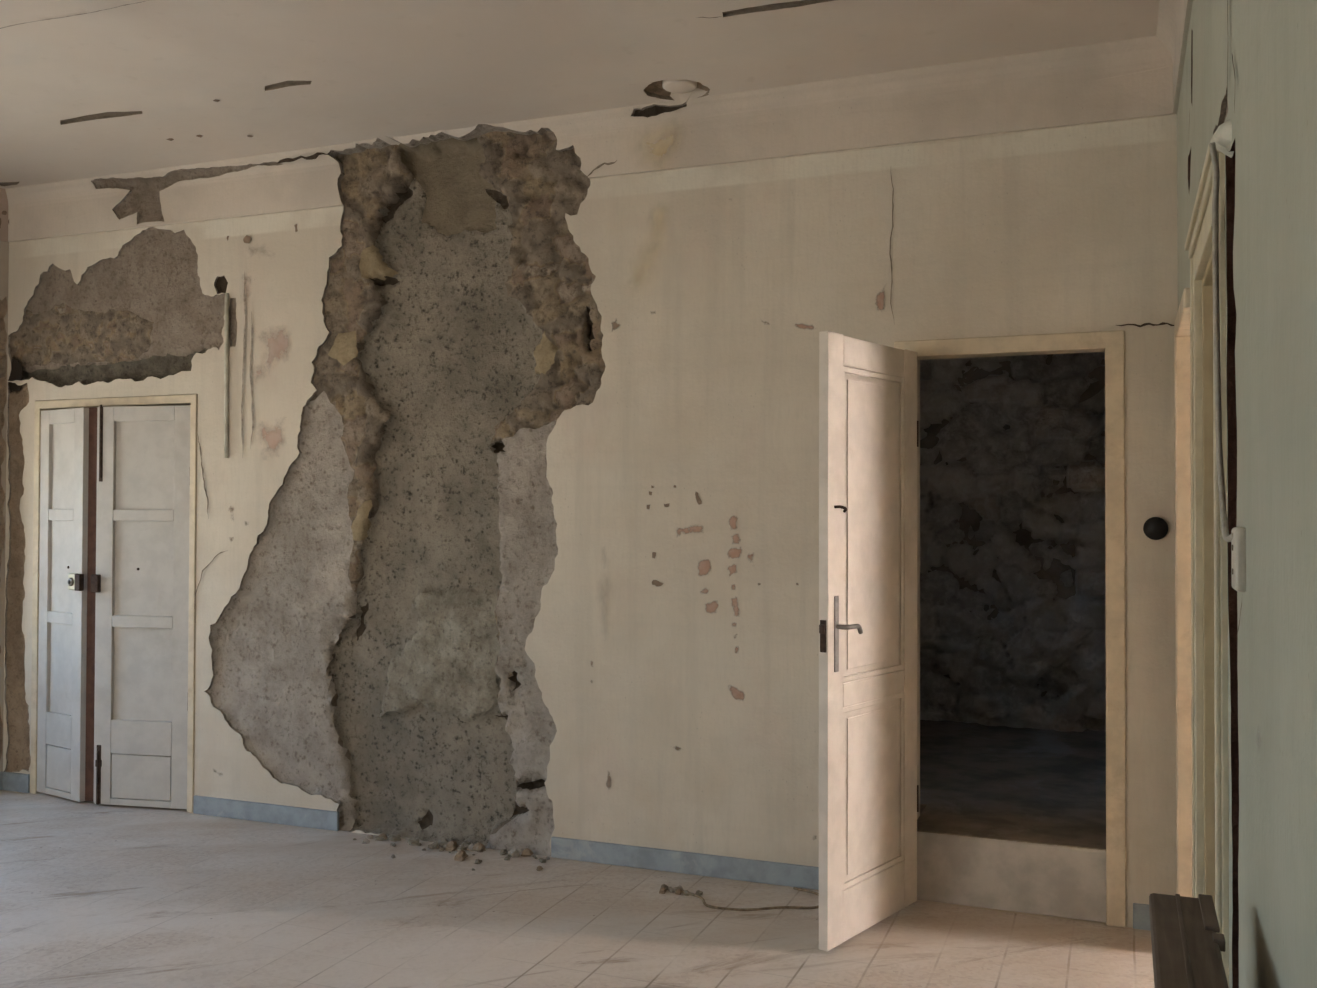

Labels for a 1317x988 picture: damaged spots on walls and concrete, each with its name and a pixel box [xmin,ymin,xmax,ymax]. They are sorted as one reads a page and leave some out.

flaking render [0,227,228,772]
flaking render [207,131,620,856]
peeling [698,516,753,626]
peeling [730,686,744,699]